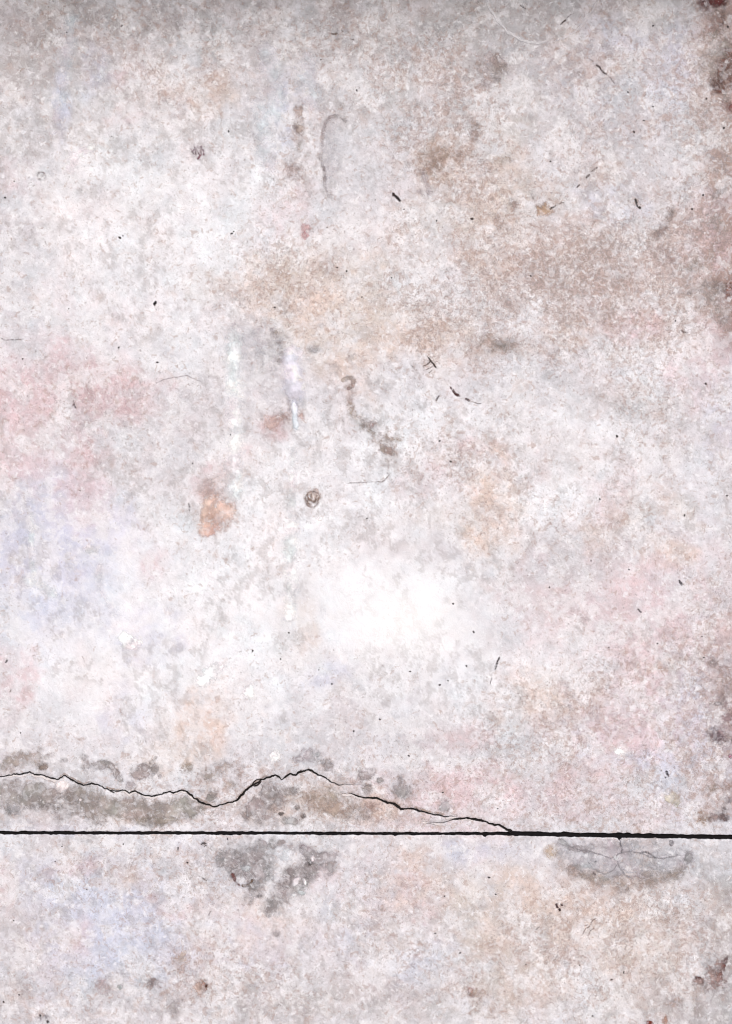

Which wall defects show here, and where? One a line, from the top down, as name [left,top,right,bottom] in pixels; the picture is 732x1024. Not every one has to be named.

crack [0,769,512,833]